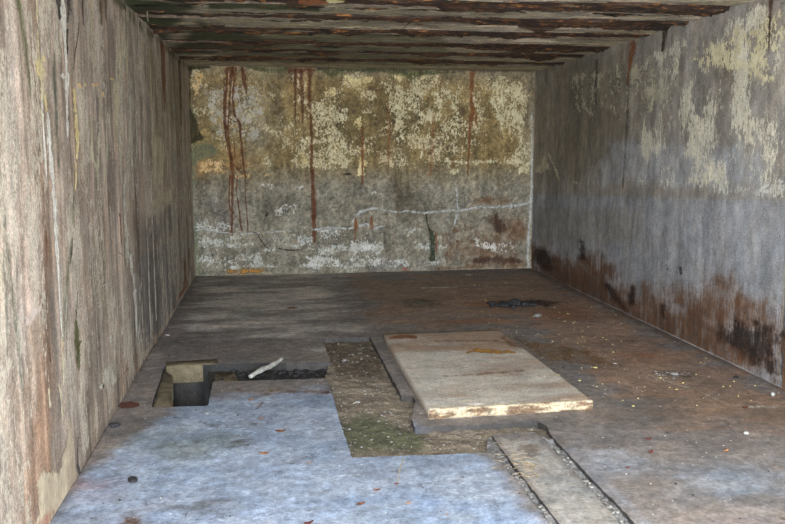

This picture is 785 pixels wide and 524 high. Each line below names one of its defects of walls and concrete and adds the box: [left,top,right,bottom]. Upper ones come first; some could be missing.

rust [223,66,249,235]
rust [286,67,317,243]
peeling [288,85,368,176]
damp [315,116,533,268]
peeling [343,72,588,184]
rust [467,71,477,176]
rust [502,44,541,57]
peeling [570,53,682,120]
peeling [687,9,785,96]